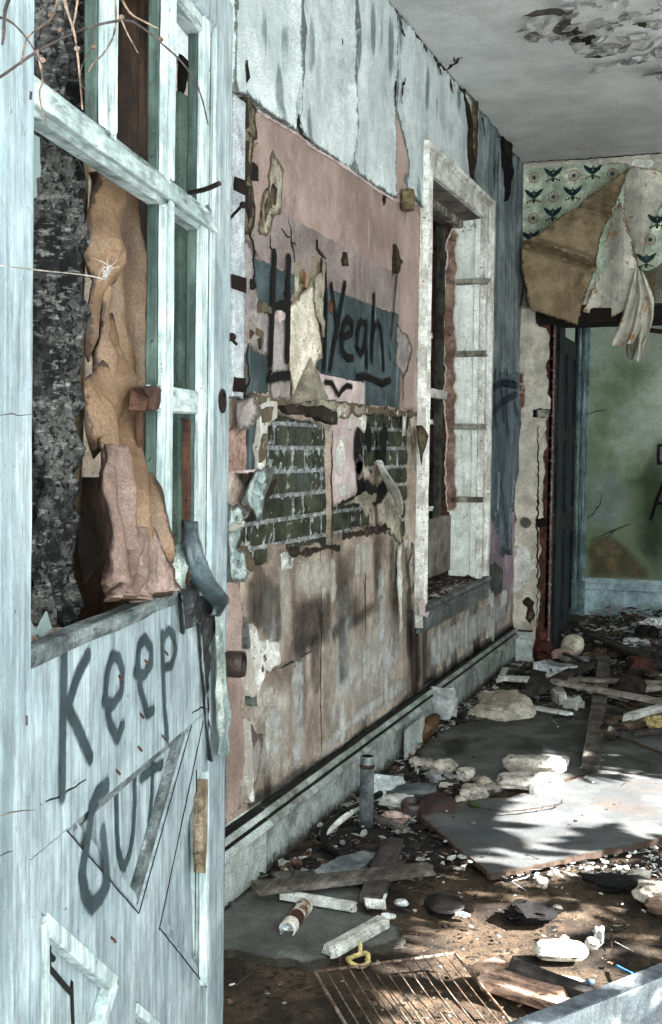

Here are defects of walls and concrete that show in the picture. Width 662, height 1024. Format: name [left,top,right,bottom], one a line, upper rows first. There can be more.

peeling [516,0,662,82]
flaking render [238,97,284,236]
peeling [247,239,333,354]
flaking render [227,401,409,582]
peeling [486,372,551,638]
peeling [242,617,281,707]
damp [249,542,513,808]
peeling [239,719,263,803]